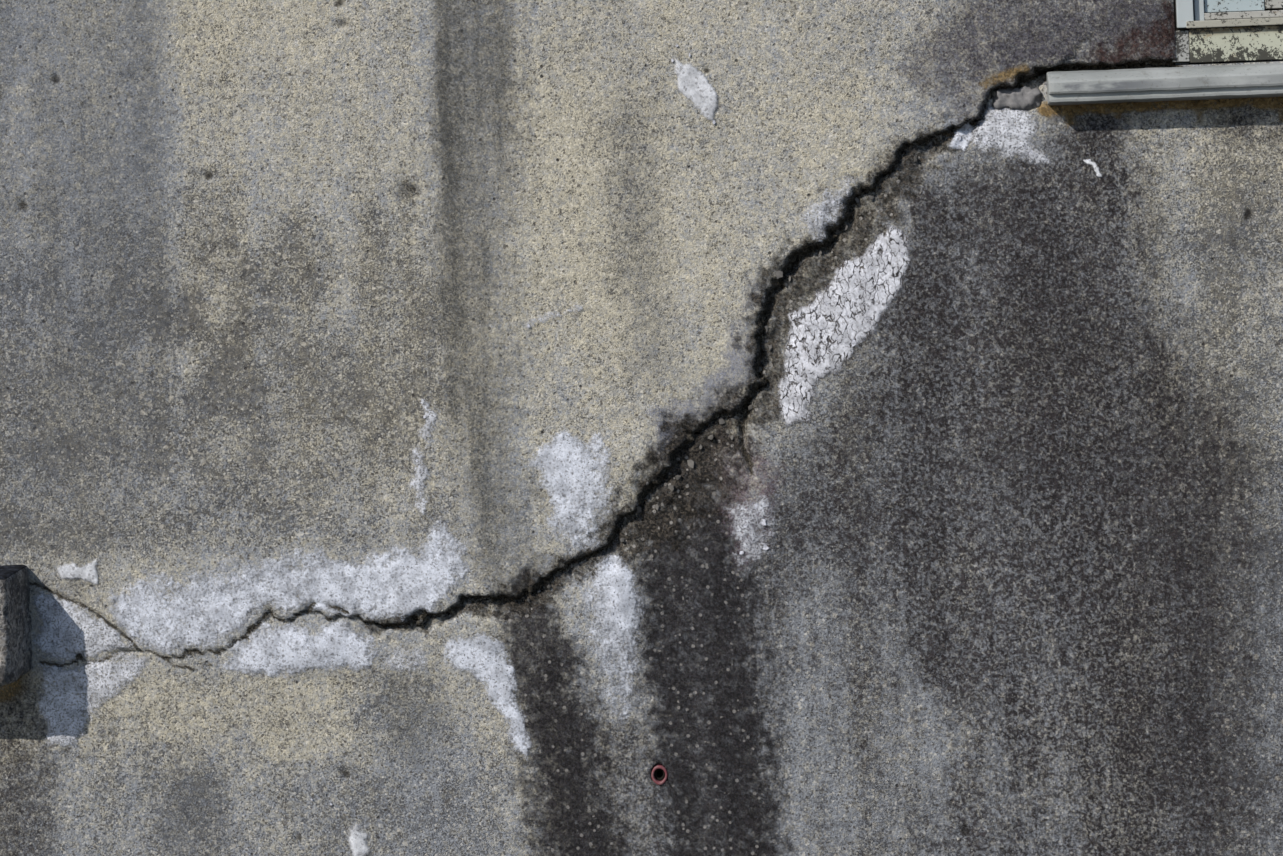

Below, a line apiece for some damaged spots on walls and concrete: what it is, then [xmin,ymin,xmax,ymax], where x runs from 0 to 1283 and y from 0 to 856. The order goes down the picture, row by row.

leakage [438,2,503,189]
corrosion [1090,1,1176,64]
leakage [0,399,468,856]
crack [33,58,1182,671]
leakage [444,108,1283,856]